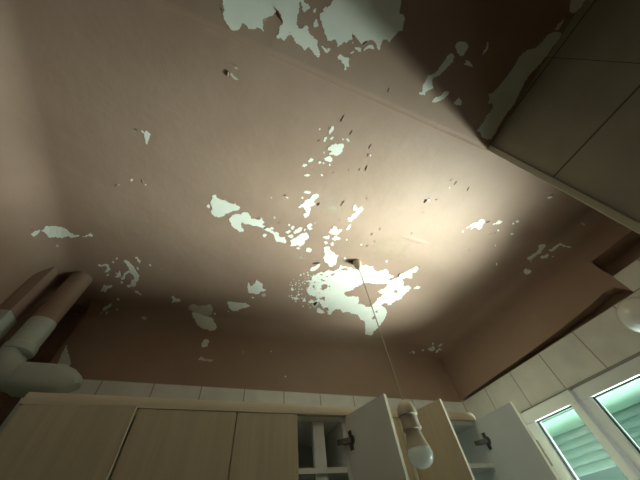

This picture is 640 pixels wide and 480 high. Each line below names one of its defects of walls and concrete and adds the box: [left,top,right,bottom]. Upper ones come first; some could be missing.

peeling [222,0,405,70]
peeling [419,41,473,103]
peeling [477,19,564,139]
peeling [302,126,352,177]
peeling [31,226,93,247]
peeling [97,256,142,295]
peeling [187,304,217,331]
peeling [227,280,266,312]
peeling [207,191,320,252]
peeling [289,204,420,335]
peeling [462,219,503,234]
peeling [524,241,570,275]